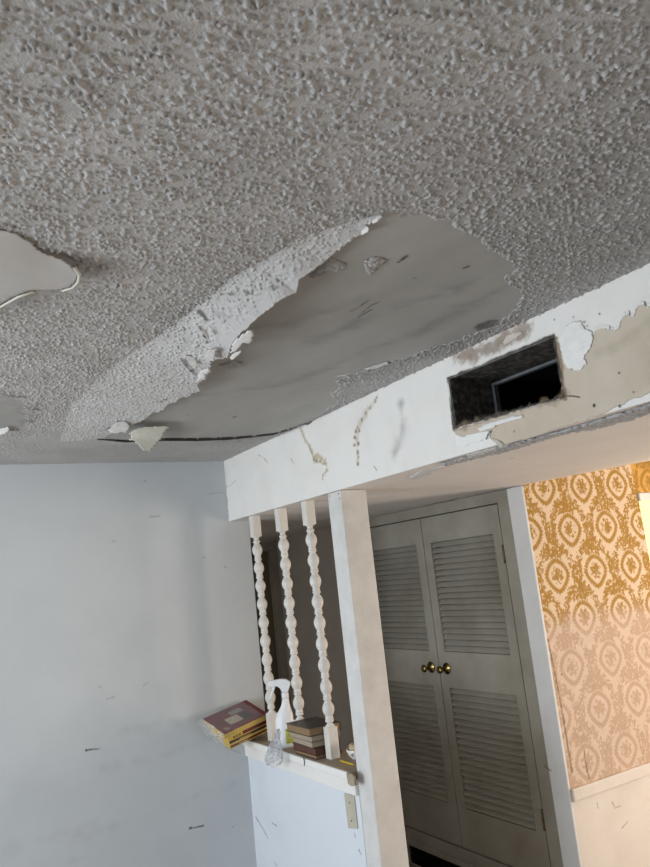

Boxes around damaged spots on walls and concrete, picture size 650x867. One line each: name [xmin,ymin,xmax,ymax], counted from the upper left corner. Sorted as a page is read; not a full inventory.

crack [98,437,135,445]
crack [159,422,308,441]
peeling [106,213,522,452]
peeling [454,300,650,458]